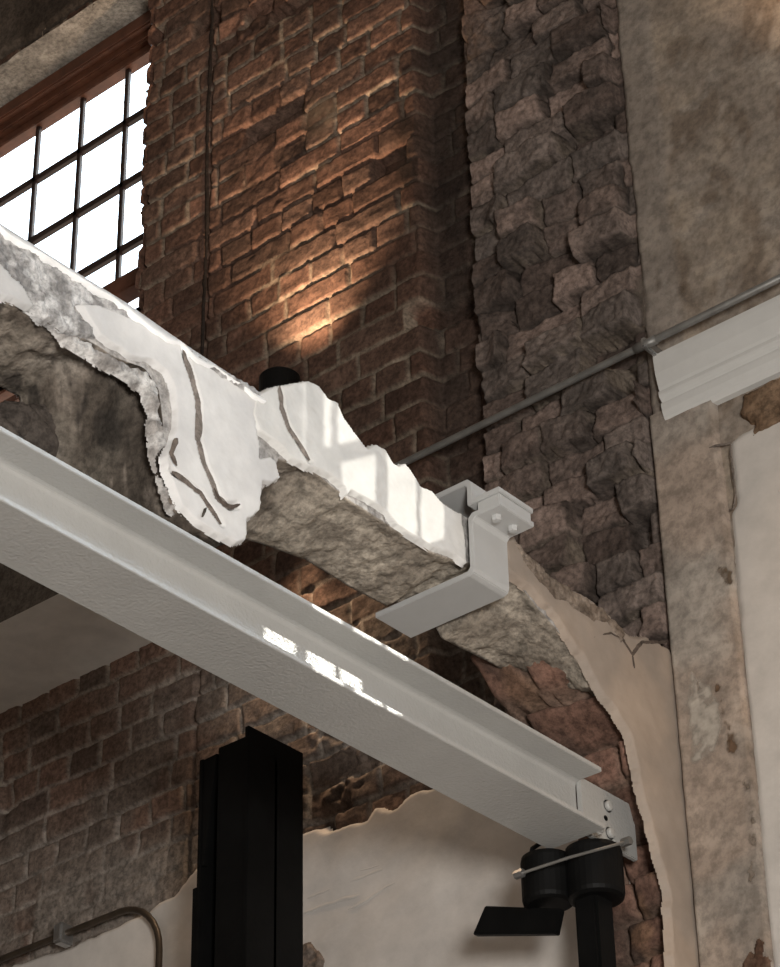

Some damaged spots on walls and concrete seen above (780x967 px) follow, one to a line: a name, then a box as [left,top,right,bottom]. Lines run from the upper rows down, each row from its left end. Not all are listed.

spalling [0,233,175,517]
spalling [181,351,261,396]
crack [278,386,310,460]
spalling [515,543,625,642]
crack [603,618,667,668]